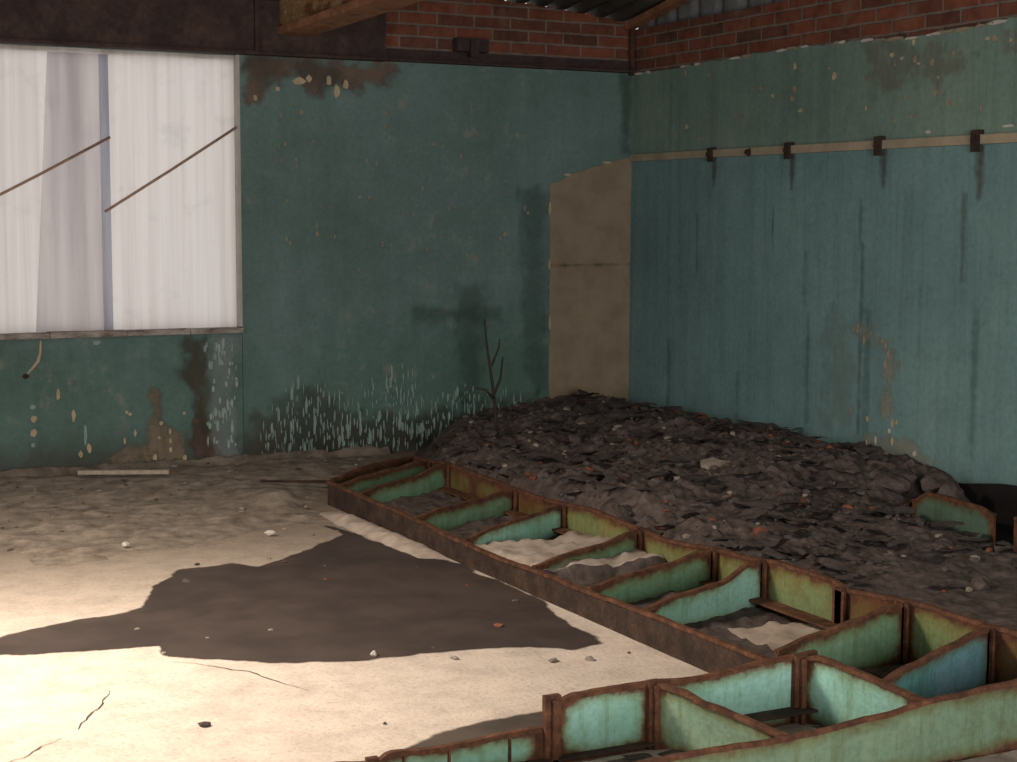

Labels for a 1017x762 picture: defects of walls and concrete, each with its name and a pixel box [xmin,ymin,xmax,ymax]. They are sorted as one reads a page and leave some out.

peeling [242,56,397,105]
spalling [861,20,1013,105]
peeling [110,389,188,464]
damp [183,338,233,457]
crack [78,691,110,729]